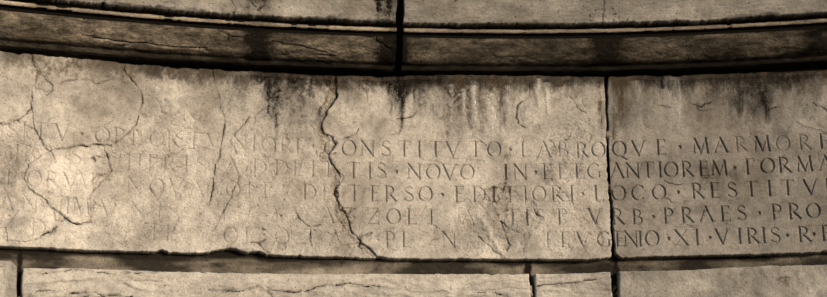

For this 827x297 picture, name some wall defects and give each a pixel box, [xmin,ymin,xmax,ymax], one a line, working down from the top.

crack [94,37,204,48]
damp [236,31,360,127]
damp [373,37,497,139]
damp [635,72,821,118]